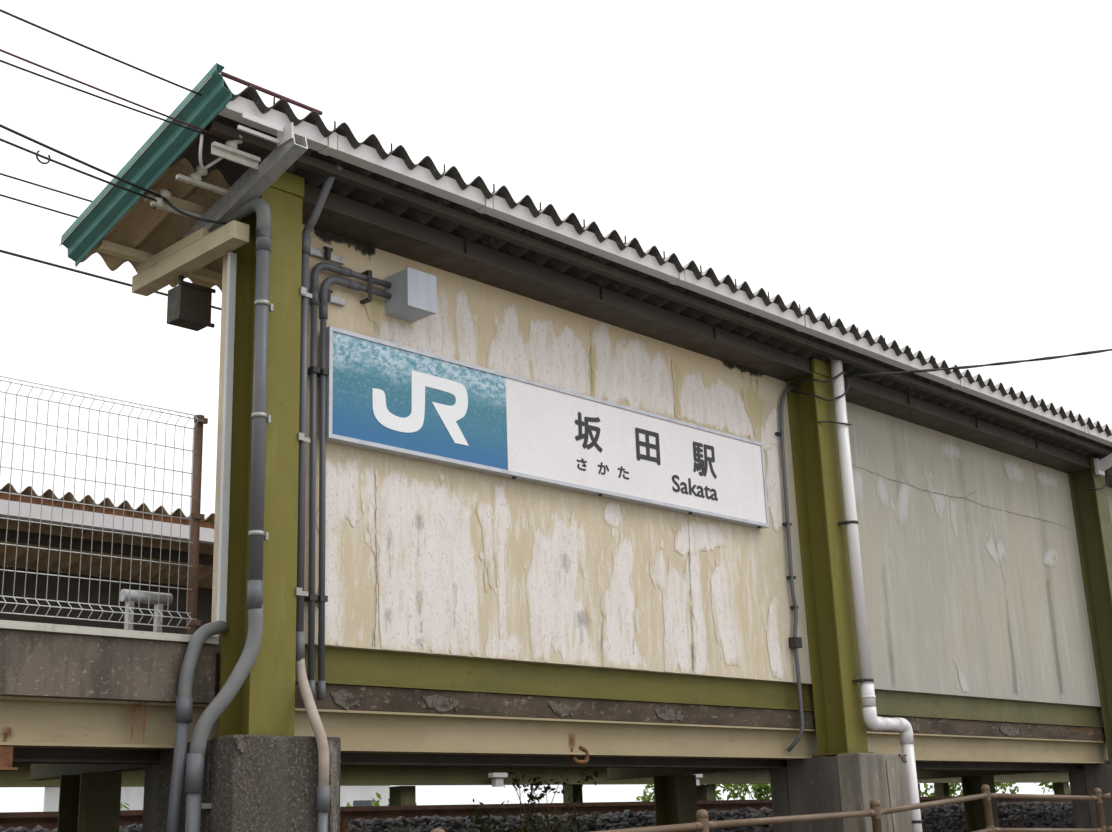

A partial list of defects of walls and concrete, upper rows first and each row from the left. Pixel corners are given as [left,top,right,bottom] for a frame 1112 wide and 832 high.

peeling [377,287,784,532]
peeling [316,456,648,670]
peeling [650,516,740,675]
peeling [764,595,784,680]
crack [853,465,1068,598]